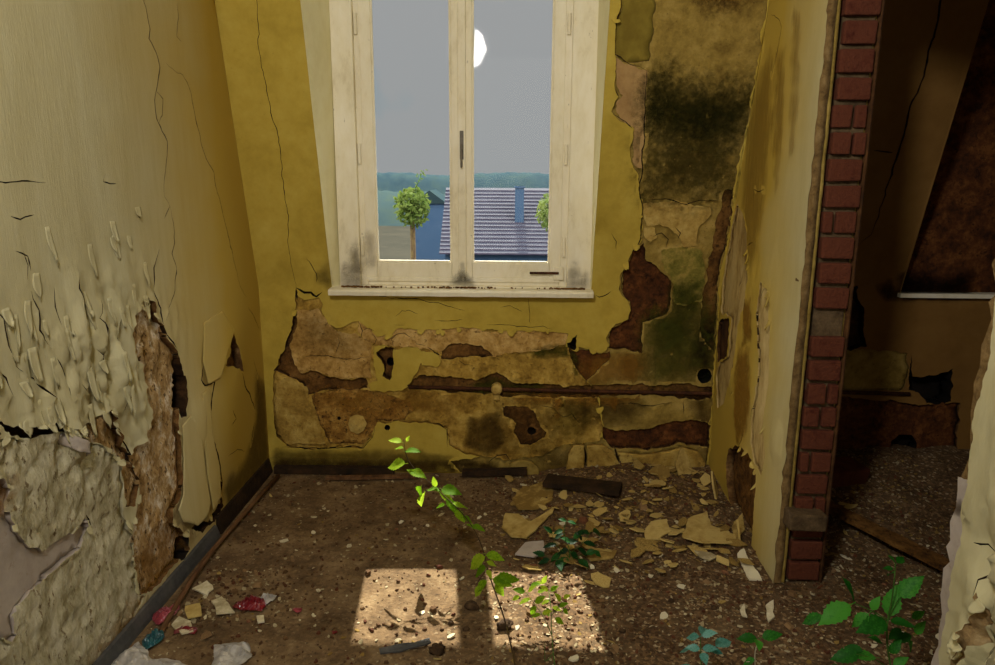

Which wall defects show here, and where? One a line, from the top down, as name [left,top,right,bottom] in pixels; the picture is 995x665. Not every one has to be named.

peeling [0,262,224,665]
crack [257,4,322,298]
flaking render [273,0,770,581]
mould [642,73,749,203]
leakage [734,304,751,442]
crack [860,0,942,244]
spalling [837,286,995,665]